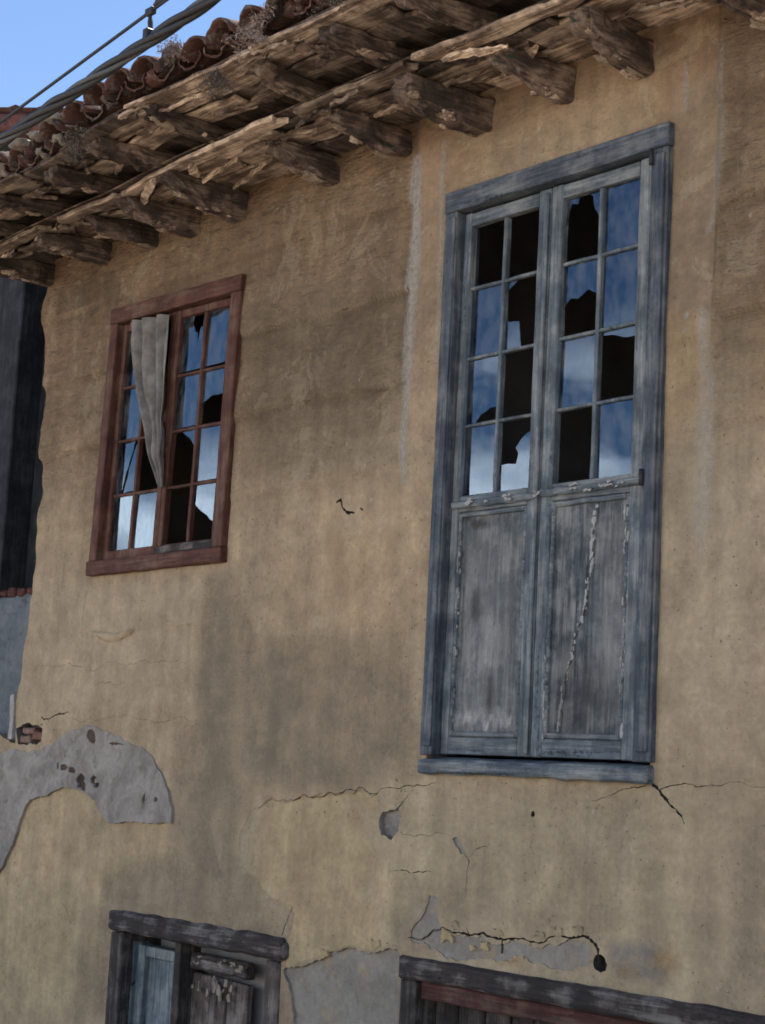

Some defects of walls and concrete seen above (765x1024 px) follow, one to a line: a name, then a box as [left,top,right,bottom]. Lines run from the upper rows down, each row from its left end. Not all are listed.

flaking render [0,694,174,872]
crack [254,783,432,809]
crack [592,781,759,824]
peeling [239,790,607,1024]
crack [408,846,603,963]